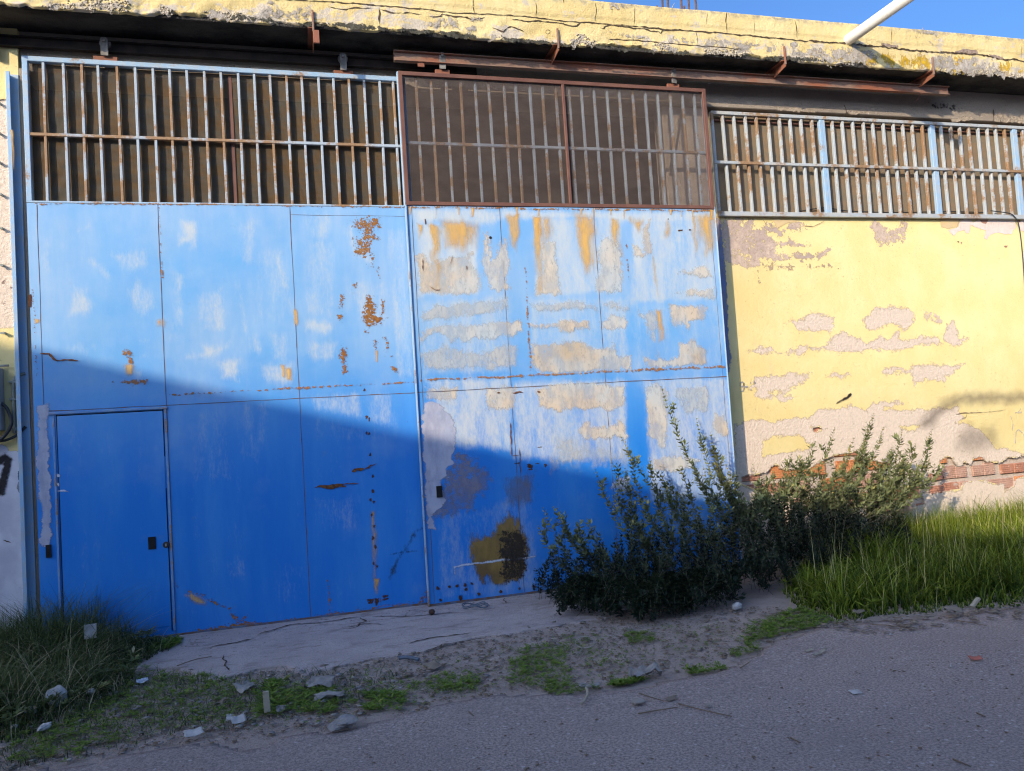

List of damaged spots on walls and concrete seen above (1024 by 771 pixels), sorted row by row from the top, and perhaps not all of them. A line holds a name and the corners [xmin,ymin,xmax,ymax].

spalling [41,0,130,14]
spalling [203,8,690,56]
corrosion [77,203,301,217]
corrosion [317,206,717,276]
peeling [721,217,839,283]
corrosion [112,349,148,385]
corrosion [169,348,366,396]
peeling [415,234,631,462]
corrosion [362,295,725,385]
peeling [644,266,716,368]
peeling [645,383,1024,560]
corrosion [357,513,536,611]